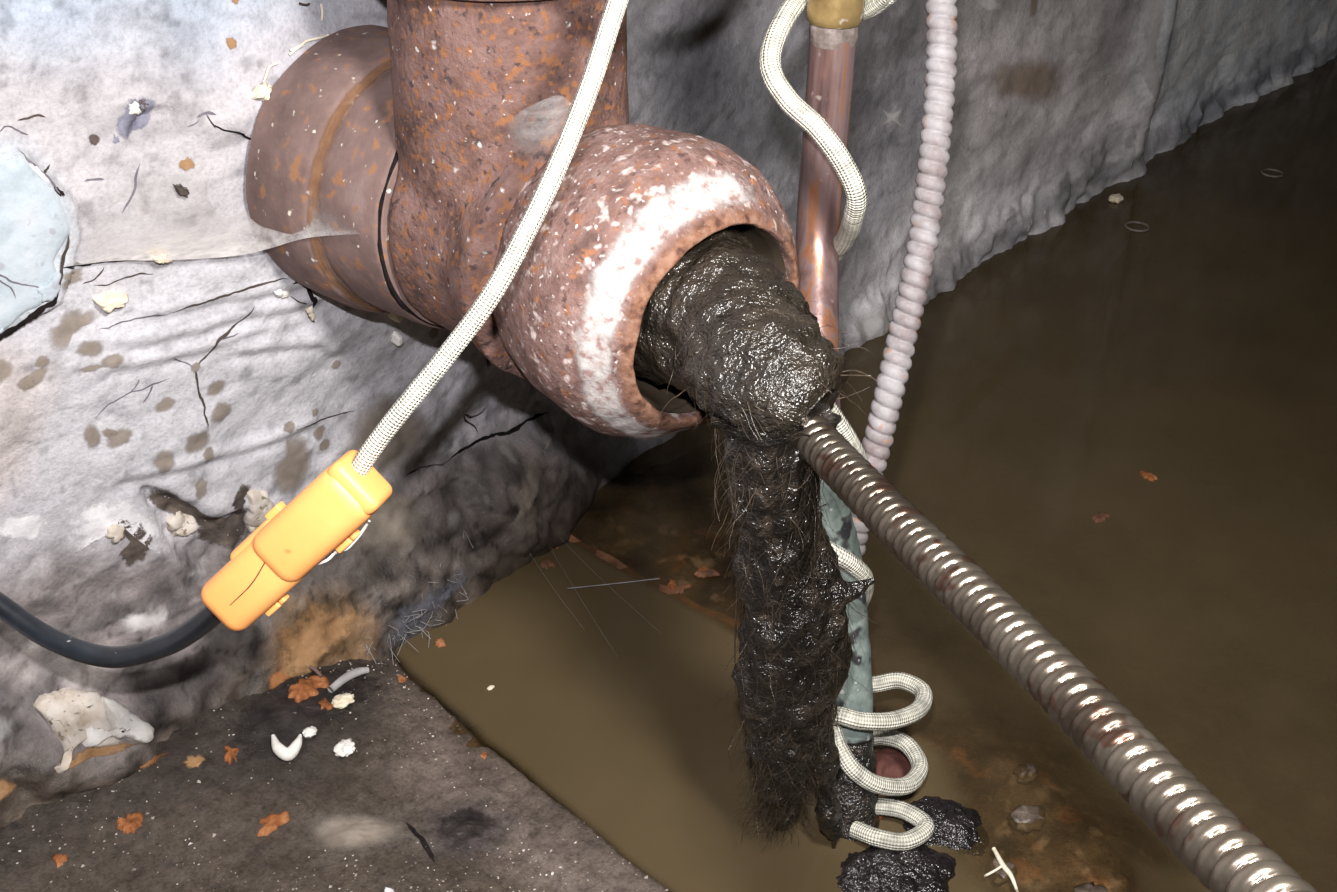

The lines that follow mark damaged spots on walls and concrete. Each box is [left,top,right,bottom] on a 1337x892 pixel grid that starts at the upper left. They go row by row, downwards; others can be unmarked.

crack [188,111,251,140]
peeling [0,159,70,341]
crack [63,258,149,288]
water stain [0,357,49,390]
water stain [53,312,122,372]
crack [95,278,318,426]
water stain [85,426,131,447]
water stain [187,381,230,461]
water stain [277,409,329,489]
crack [405,405,548,477]
spalling [105,520,152,566]
spalling [149,485,274,547]